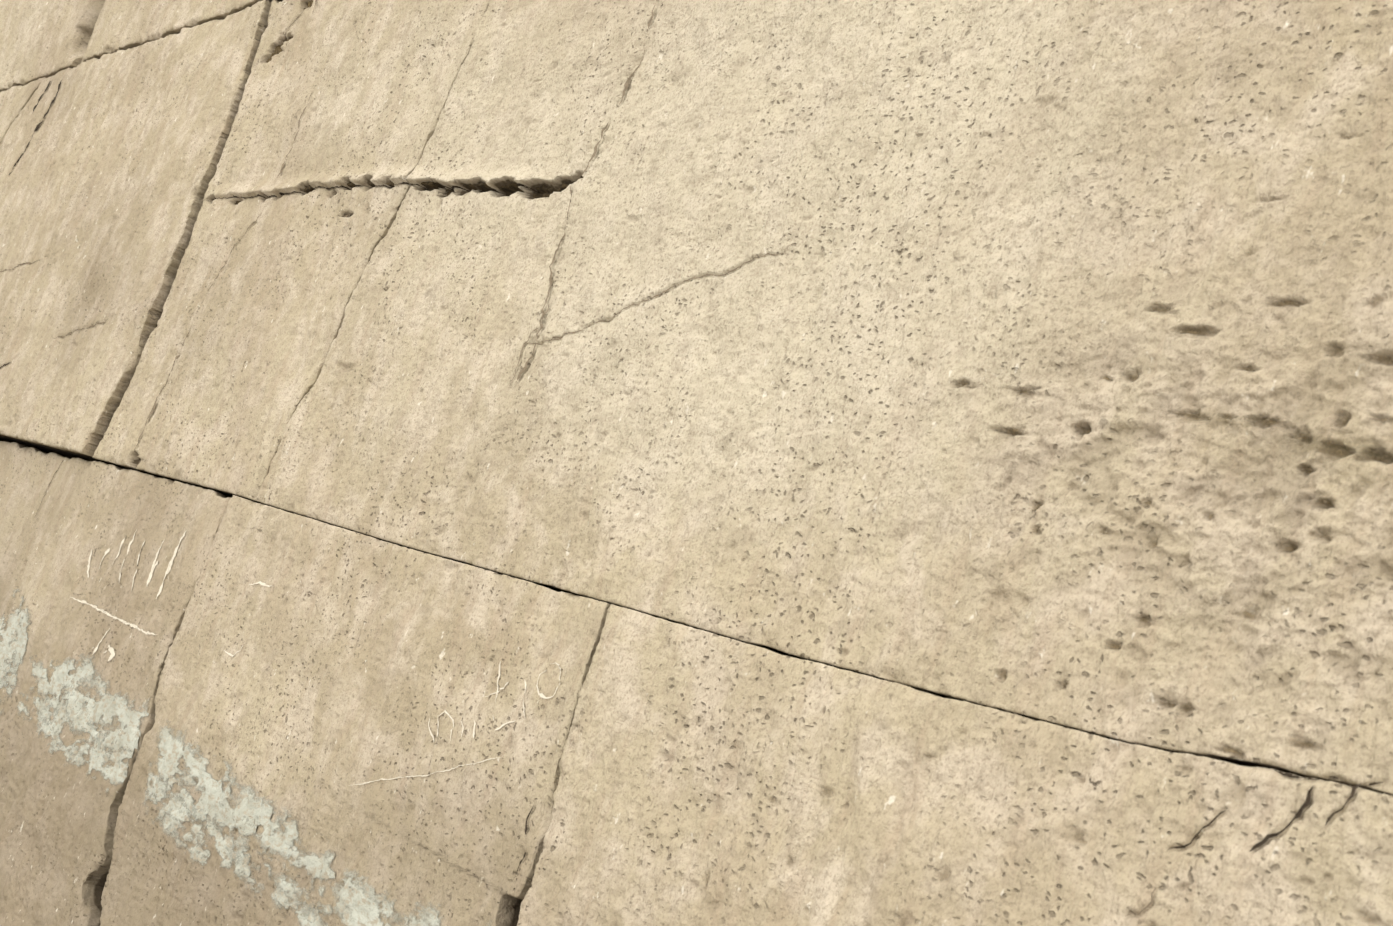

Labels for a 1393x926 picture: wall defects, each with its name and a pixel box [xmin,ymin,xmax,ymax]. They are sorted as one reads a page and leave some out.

crack [134,1,783,454]
water stain [0,589,149,792]
water stain [143,726,440,926]